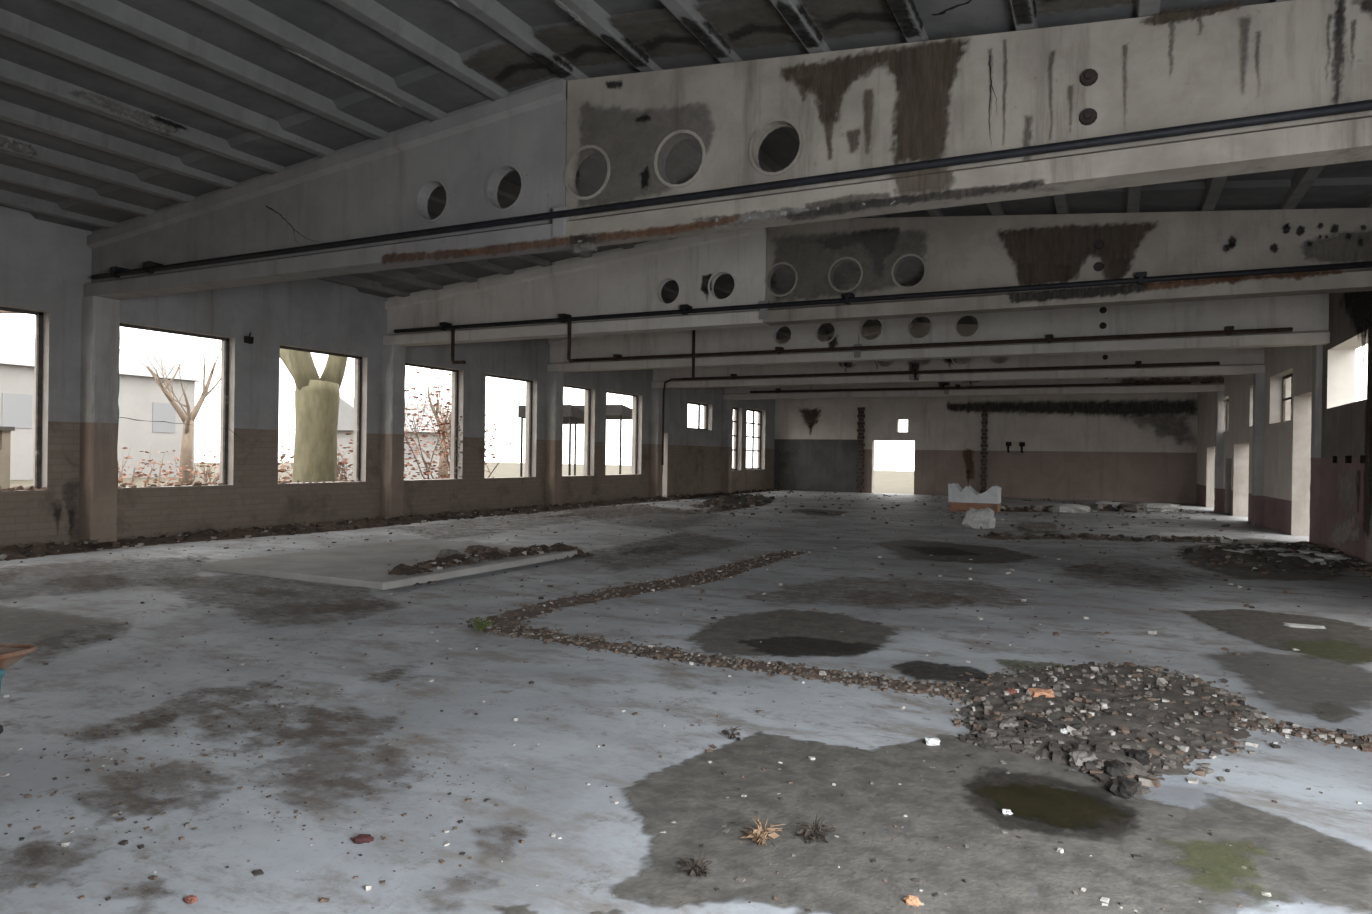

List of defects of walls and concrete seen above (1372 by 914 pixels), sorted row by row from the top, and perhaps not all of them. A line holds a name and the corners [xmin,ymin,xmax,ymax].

crack [932,0,972,16]
leakage [1144,3,1239,51]
leakage [1328,0,1372,102]
leakage [464,0,1044,300]